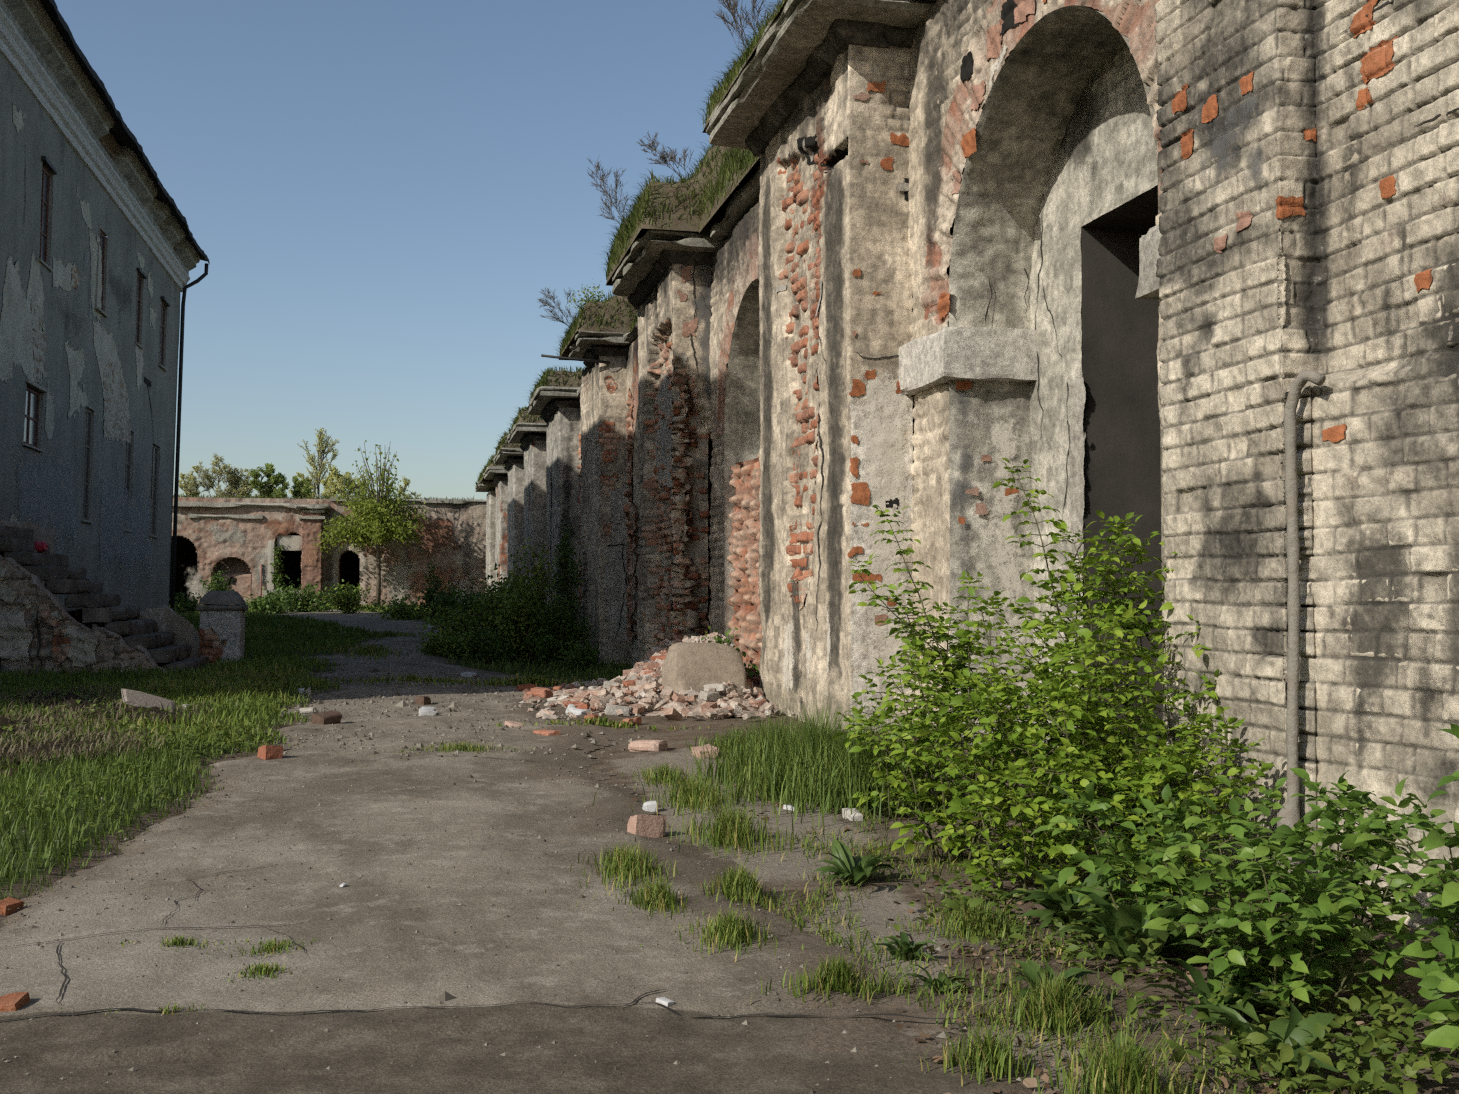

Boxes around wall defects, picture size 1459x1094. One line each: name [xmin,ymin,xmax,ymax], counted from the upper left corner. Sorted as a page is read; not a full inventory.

spalling [1350,0,1398,110]
leakage [1251,148,1261,181]
peeling [0,188,144,445]
peeling [642,318,710,488]
spalling [776,133,909,610]
leakage [1432,248,1459,394]
leakage [1343,537,1434,767]
leakage [1447,544,1459,676]
crack [0,864,1028,1021]